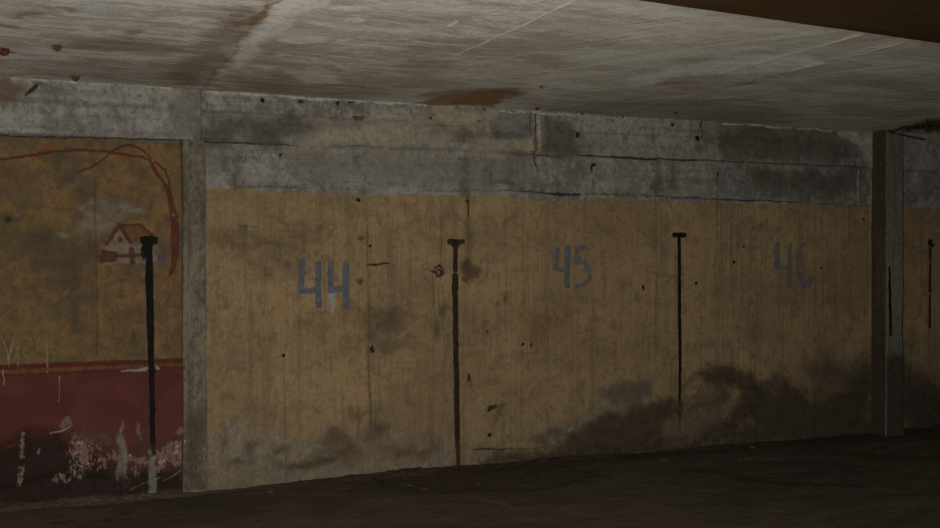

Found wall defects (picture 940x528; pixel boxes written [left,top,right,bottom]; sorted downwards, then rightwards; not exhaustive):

crack [533,110,547,166]
crack [583,121,859,167]
water stain [486,347,940,464]
peeling [50,416,186,483]